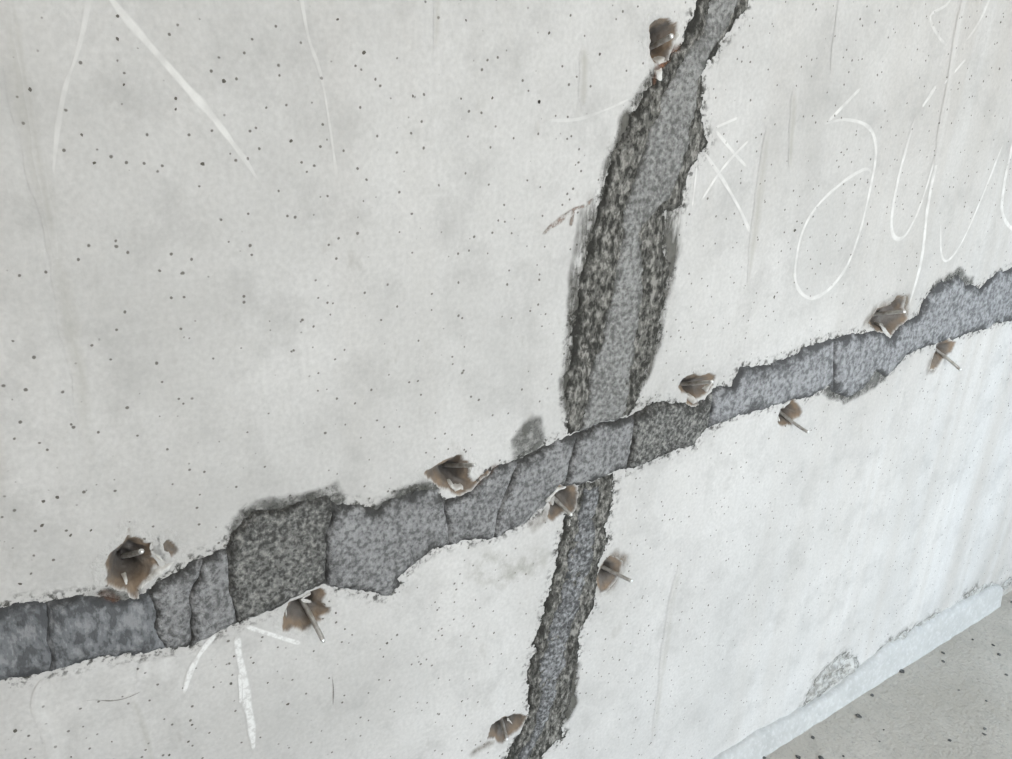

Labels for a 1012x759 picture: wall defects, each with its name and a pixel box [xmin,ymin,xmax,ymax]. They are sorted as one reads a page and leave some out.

crack [560,0,750,434]
crack [0,267,1012,759]